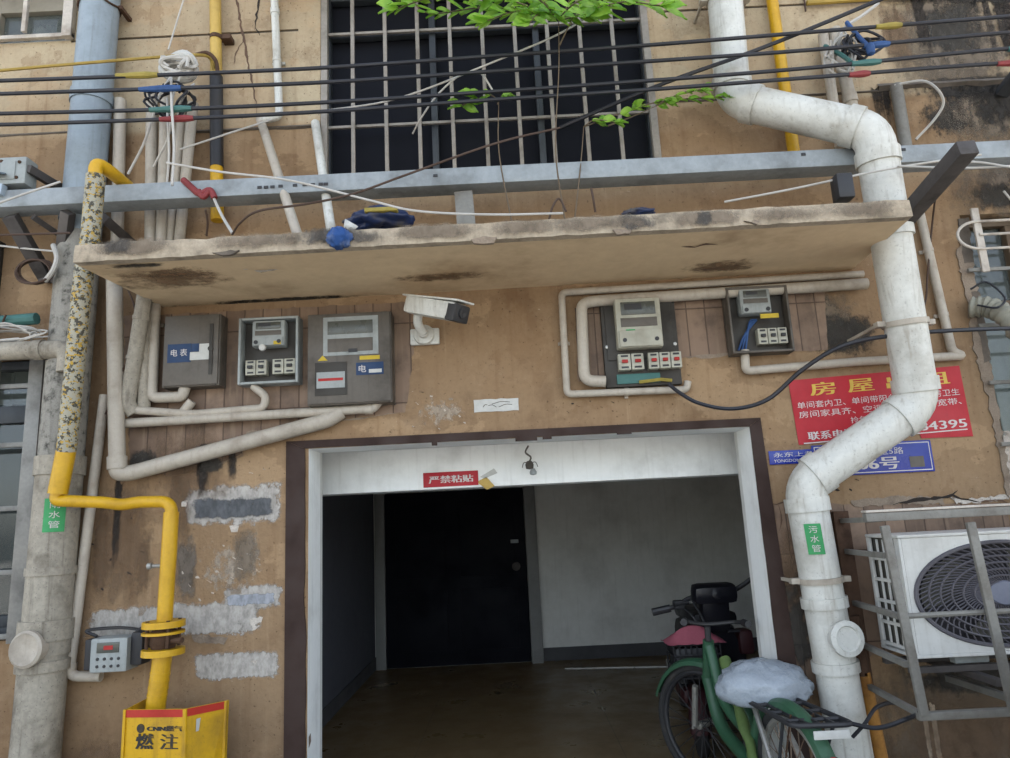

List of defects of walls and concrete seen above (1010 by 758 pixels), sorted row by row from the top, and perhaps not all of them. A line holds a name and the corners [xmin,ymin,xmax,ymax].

crack [233,0,260,109]
leakage [871,86,893,117]
leakage [883,0,1010,140]
peeling [90,606,157,636]
peeling [173,482,283,681]